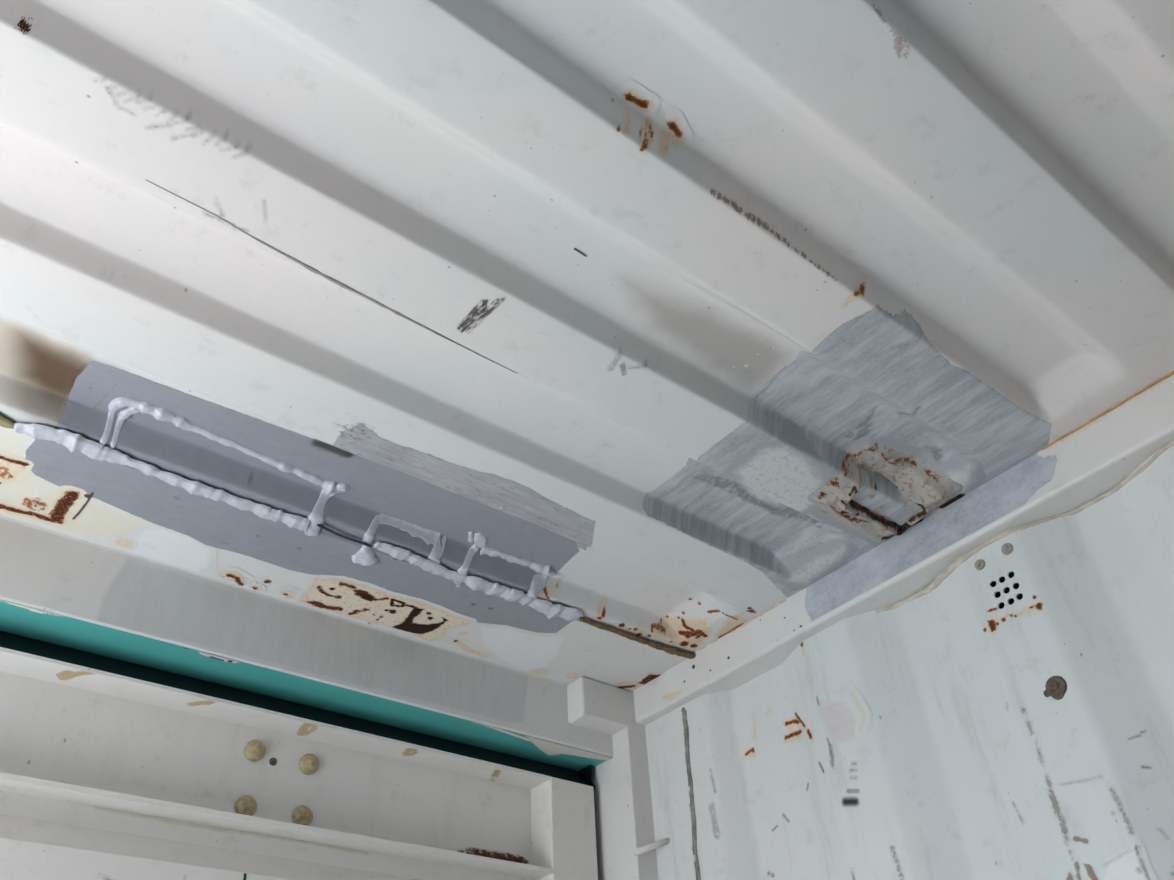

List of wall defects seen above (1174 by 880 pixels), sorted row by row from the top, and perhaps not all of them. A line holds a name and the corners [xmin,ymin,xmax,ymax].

rust [613,80,693,169]
water stain [0,314,157,545]
rust [1037,374,1174,458]
rust [0,450,34,485]
rust [0,485,88,528]
rust [807,437,965,547]
rust [211,568,495,661]
rust [588,591,756,653]
rust [981,595,1053,640]
rust [609,670,666,692]
rust [779,711,817,748]
rust [459,848,529,864]